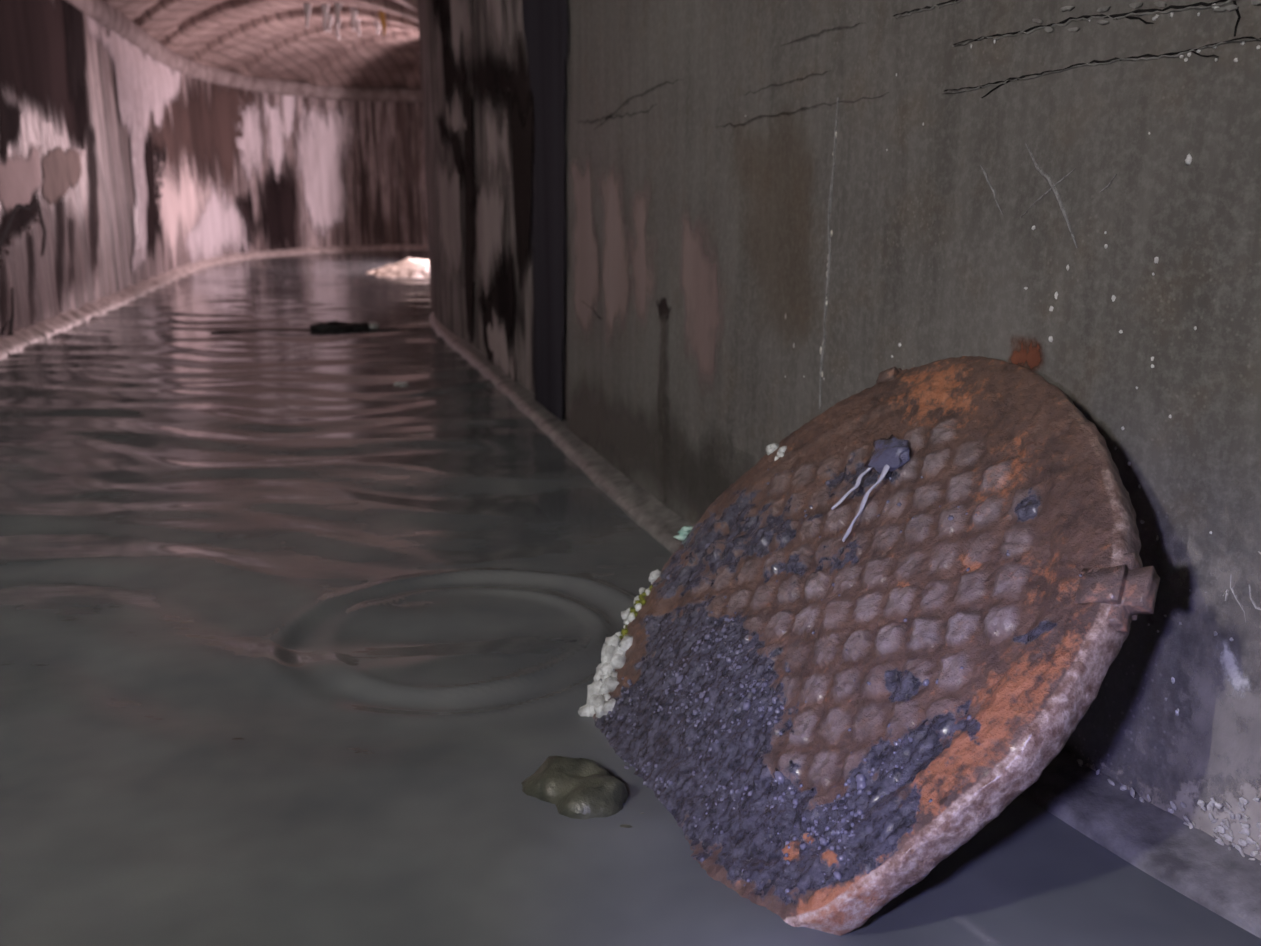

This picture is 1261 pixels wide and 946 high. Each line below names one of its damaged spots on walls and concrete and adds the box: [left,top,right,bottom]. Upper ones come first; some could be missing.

crack [893,0,962,18]
crack [944,0,1261,98]
damp [0,0,100,287]
damp [28,234,36,323]
damp [57,199,75,310]
damp [432,0,729,513]